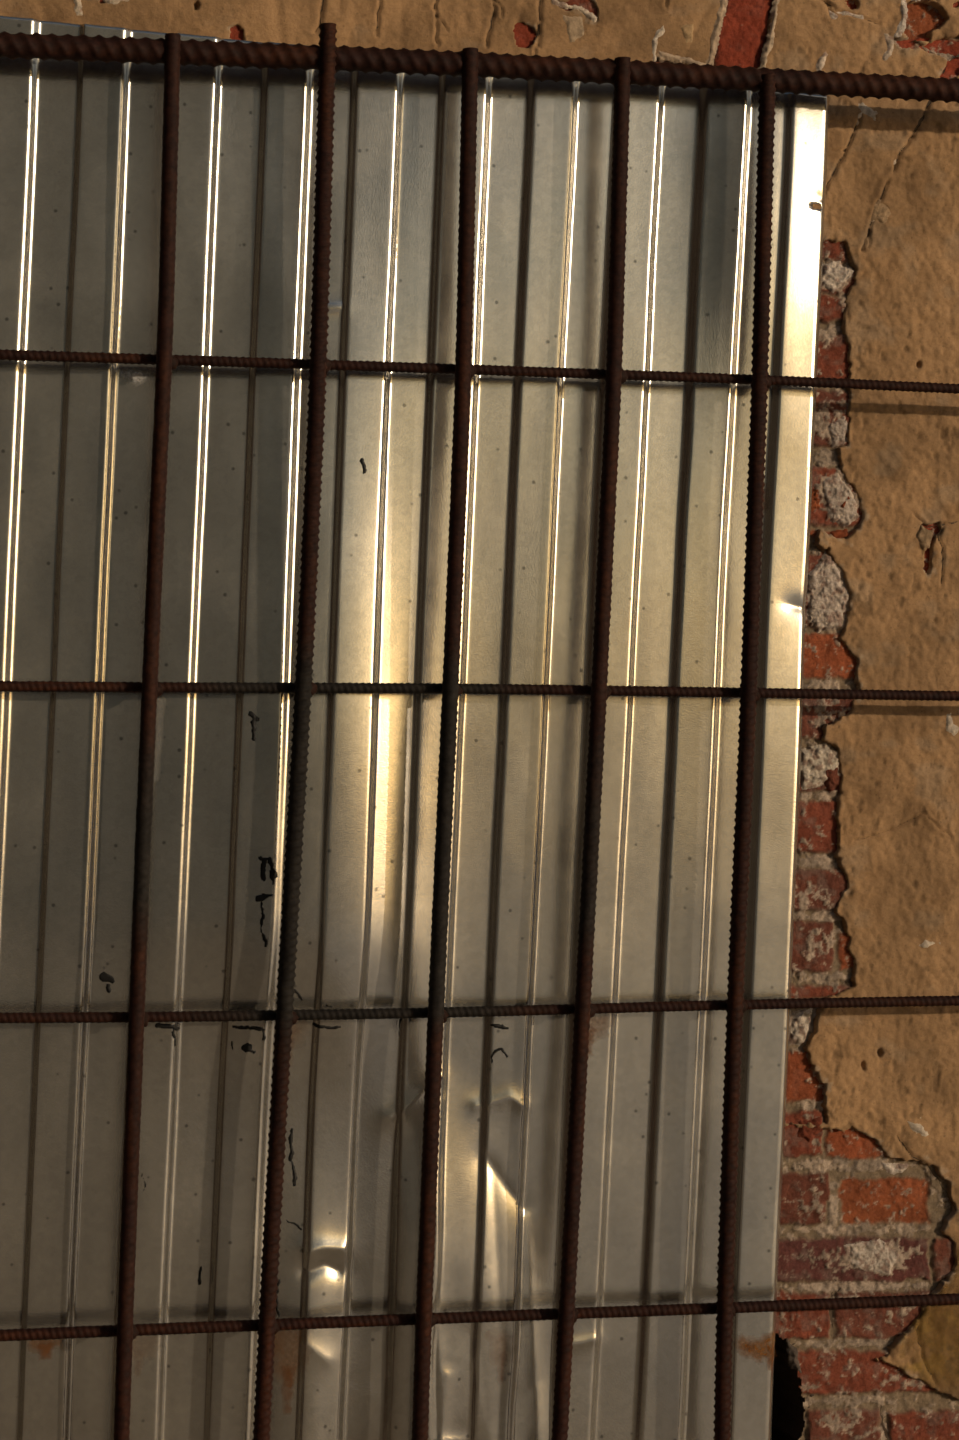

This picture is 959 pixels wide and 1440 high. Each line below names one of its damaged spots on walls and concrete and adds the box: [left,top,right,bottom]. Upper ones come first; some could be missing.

flaking render [73,0,129,16]
flaking render [652,0,780,69]
flaking render [882,0,959,79]
flaking render [775,240,959,1440]